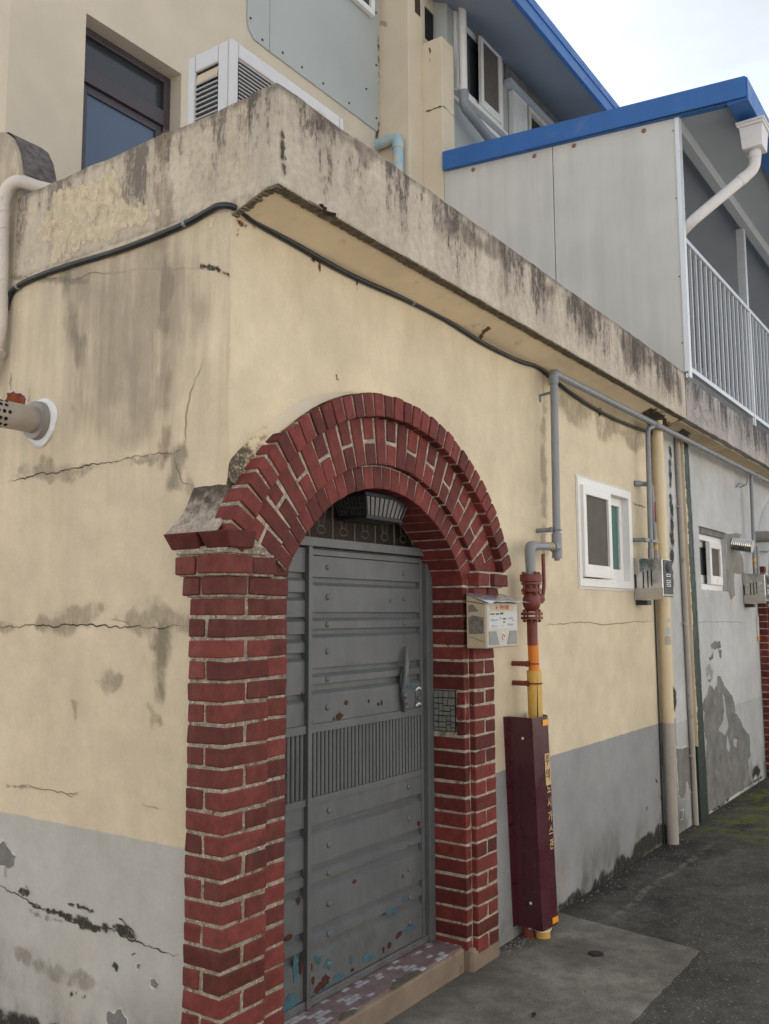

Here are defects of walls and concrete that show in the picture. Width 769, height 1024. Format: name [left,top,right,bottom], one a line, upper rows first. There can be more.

peeling [40,171,160,263]
crack [10,368,201,485]
crack [3,618,183,688]
peeling [642,408,751,820]
peeling [0,838,16,869]
water stain [558,824,667,911]
crack [0,885,177,955]